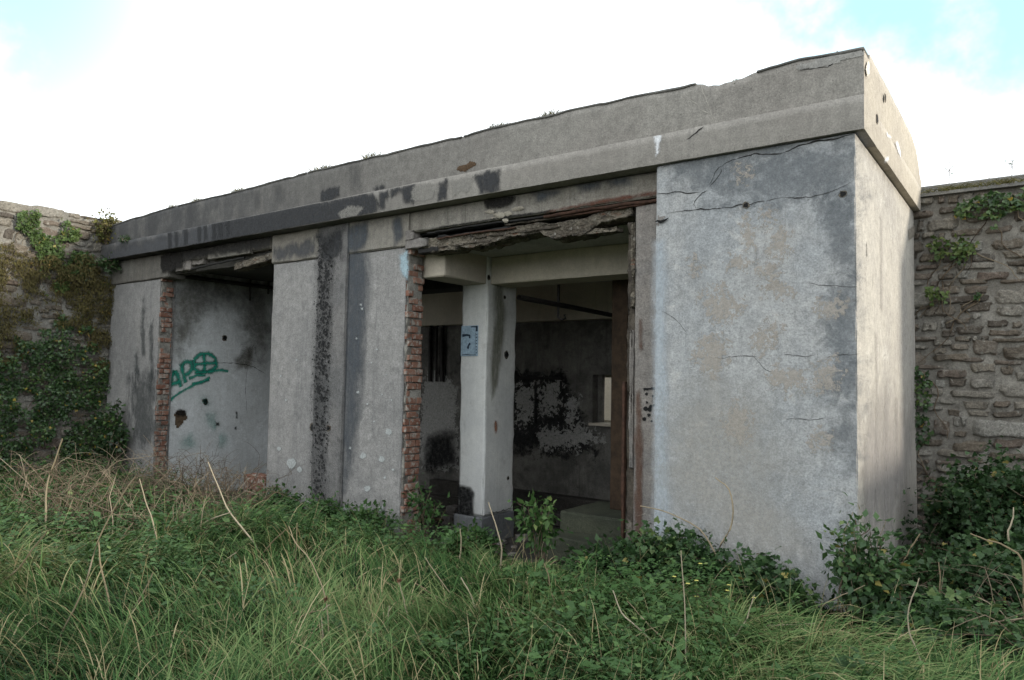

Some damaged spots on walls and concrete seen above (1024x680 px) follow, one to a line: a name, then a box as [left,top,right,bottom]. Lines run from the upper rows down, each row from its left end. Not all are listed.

leakage [321,187,339,202]
crack [658,133,857,213]
leakage [129,309,156,444]
flaking render [153,244,272,479]
spalling [400,191,668,552]